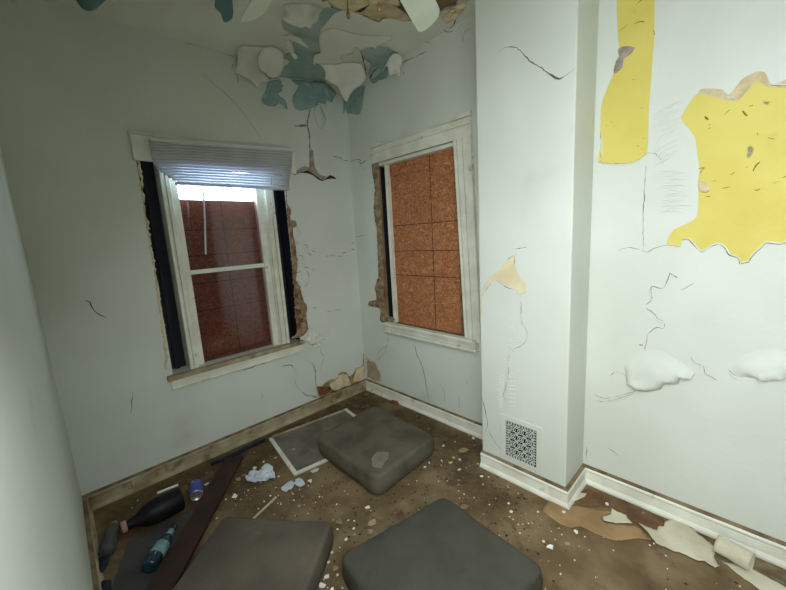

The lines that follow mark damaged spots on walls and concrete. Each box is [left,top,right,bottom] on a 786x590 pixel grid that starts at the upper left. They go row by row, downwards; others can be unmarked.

peeling [215,0,233,22]
peeling [235,0,411,115]
crack [500,46,573,80]
peeling [598,0,655,165]
crack [293,110,366,181]
peeling [667,71,786,264]
flaking render [286,192,324,348]
flaking render [317,353,365,397]
flaking render [368,163,394,322]
crack [502,301,528,401]
crack [639,272,694,352]
crack [690,358,743,381]